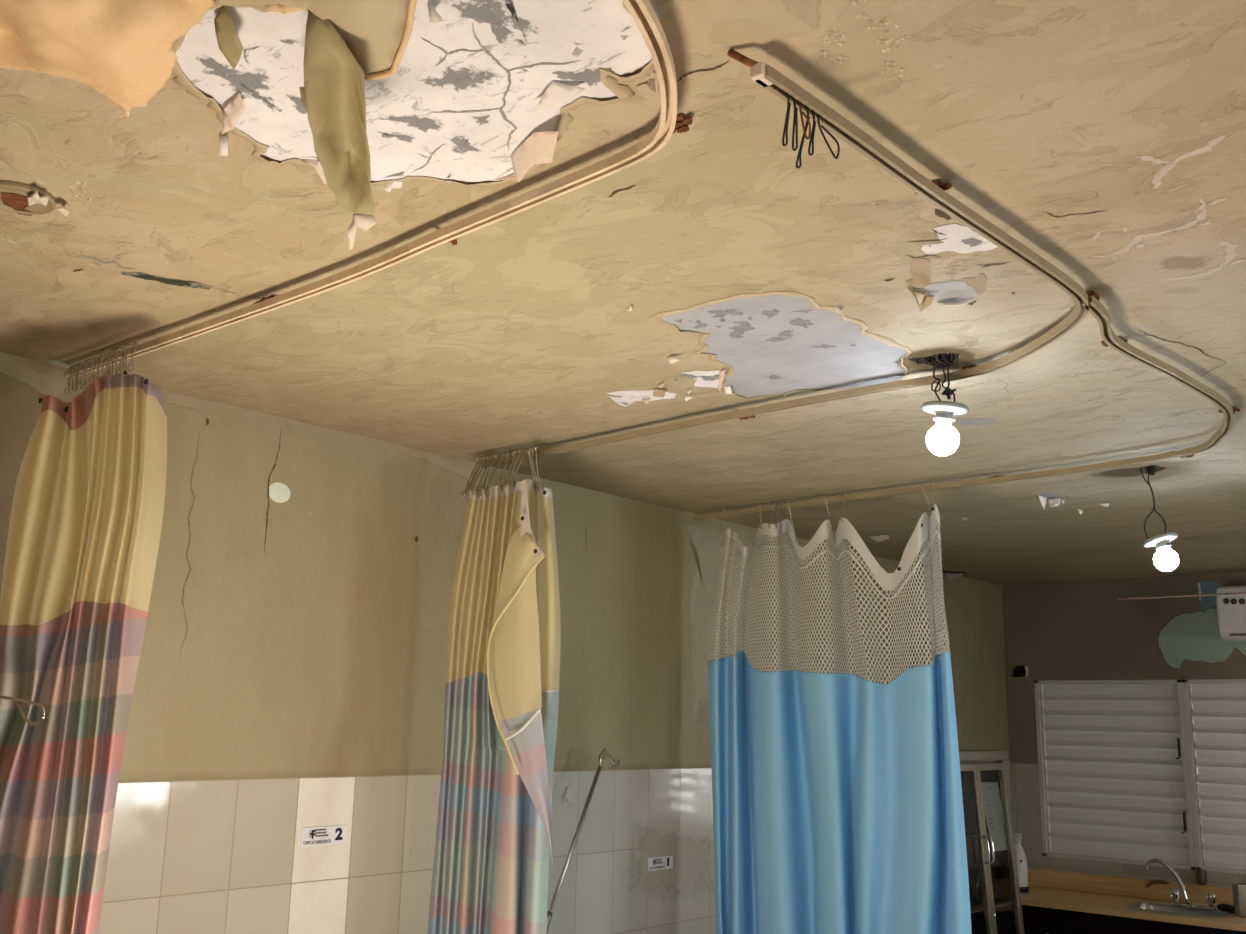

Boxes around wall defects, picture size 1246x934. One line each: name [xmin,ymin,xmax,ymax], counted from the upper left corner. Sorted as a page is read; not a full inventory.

peeling [0,0,659,250]
crack [73,242,235,294]
peeling [885,208,1009,313]
peeling [607,291,913,407]
crack [179,429,200,659]
crack [264,432,281,554]
peeling [1157,581,1246,671]